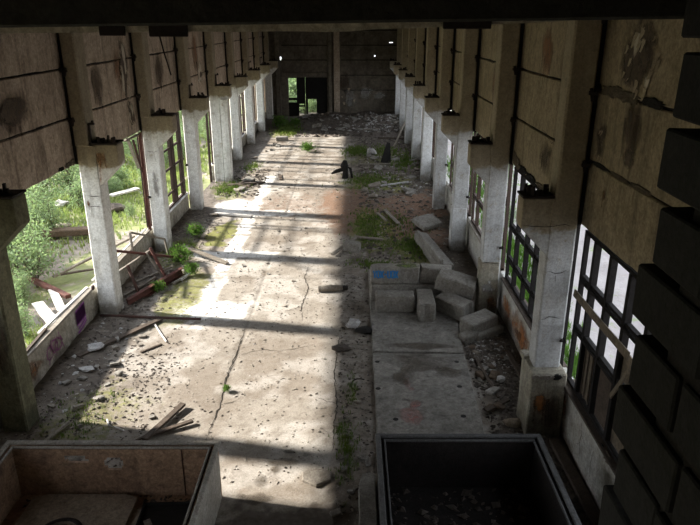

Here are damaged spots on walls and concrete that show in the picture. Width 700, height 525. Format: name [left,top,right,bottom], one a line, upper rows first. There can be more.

water stain [91,69,103,110]
peeling [598,20,665,110]
spalling [513,151,543,190]
crack [206,329,305,439]